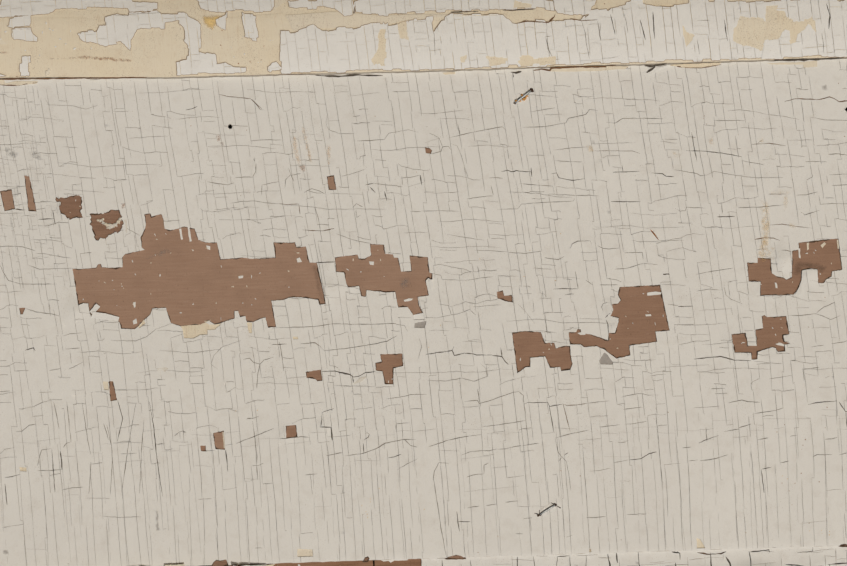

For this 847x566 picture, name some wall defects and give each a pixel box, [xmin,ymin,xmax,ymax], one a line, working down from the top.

crack [303,71,383,79]
crack [622,136,763,177]
peeling [55,195,124,241]
crack [718,153,847,252]
peeling [73,213,326,338]
peeling [335,243,433,328]
peeling [747,239,842,296]
crack [246,323,407,384]
peeling [512,285,670,373]
peeling [732,315,790,360]
crack [5,402,185,502]
crack [321,391,646,566]